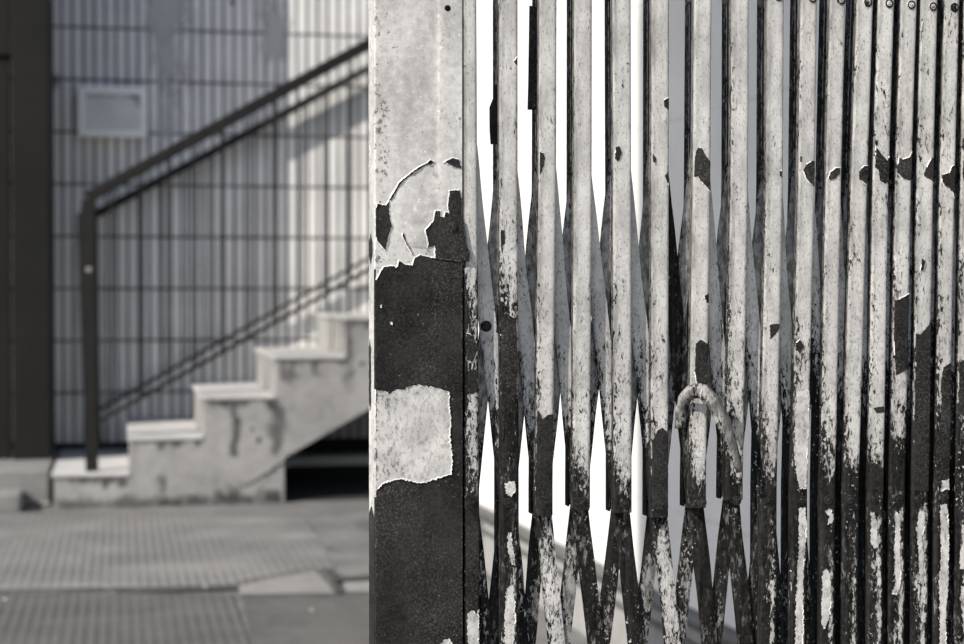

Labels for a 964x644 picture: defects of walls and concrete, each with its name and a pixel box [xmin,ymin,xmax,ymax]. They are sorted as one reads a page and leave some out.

peeling [359,157,479,644]